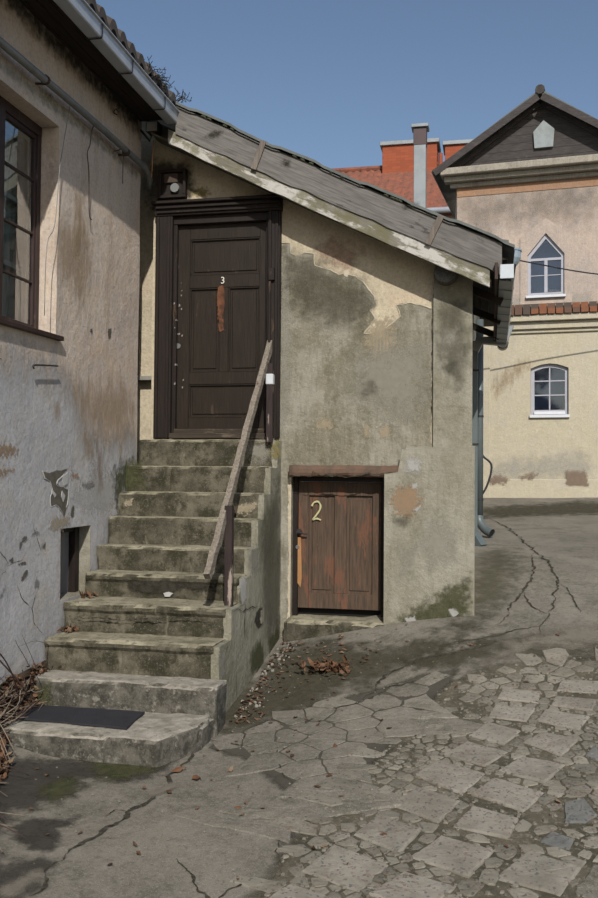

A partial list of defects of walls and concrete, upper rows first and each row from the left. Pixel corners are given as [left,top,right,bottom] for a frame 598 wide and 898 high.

peeling [0,444,19,477]
peeling [277,242,433,636]
flaking render [42,469,94,530]
flaking render [9,531,46,588]
crack [30,864,51,896]